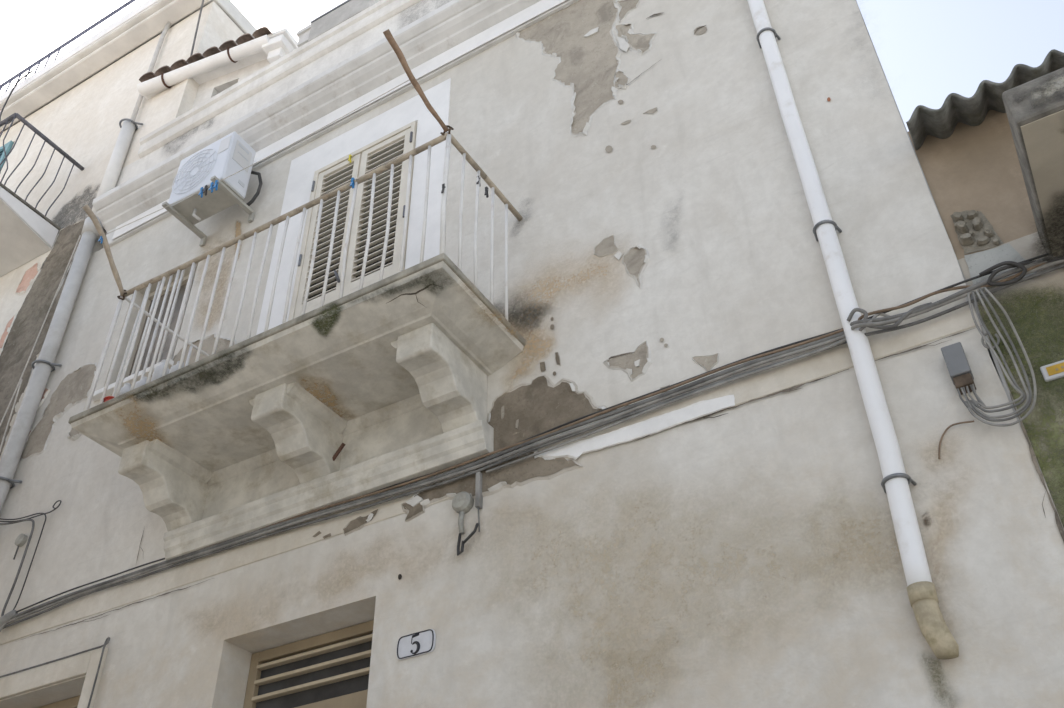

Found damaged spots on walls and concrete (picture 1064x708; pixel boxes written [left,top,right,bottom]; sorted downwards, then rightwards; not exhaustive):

flaking render [515,0,659,137]
damp [1015,77,1064,108]
flaking render [594,235,650,289]
flaking render [0,220,85,460]
damp [504,307,542,328]
flaking render [603,338,668,382]
flaking render [692,353,719,372]
damp [989,300,1064,394]
flaking render [20,363,100,461]
flaking render [401,352,630,522]
flaking render [312,509,378,539]